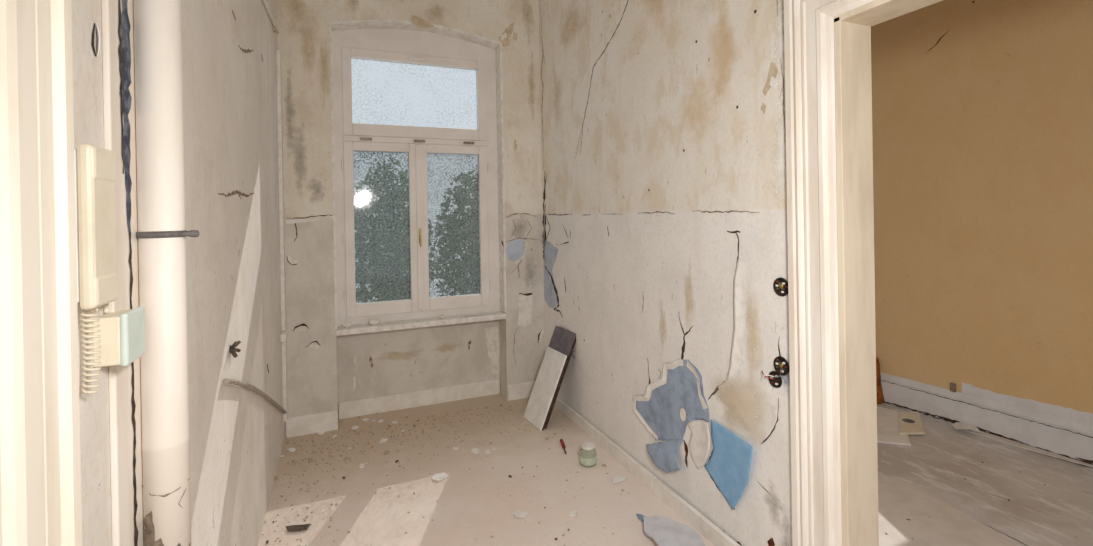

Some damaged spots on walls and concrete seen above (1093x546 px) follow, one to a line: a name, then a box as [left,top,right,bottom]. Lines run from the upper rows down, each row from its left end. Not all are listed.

crack [575,1,628,158]
crack [778,58,786,142]
peeling [505,213,563,326]
crack [542,159,573,268]
peeling [633,318,753,510]
peeling [143,511,164,546]